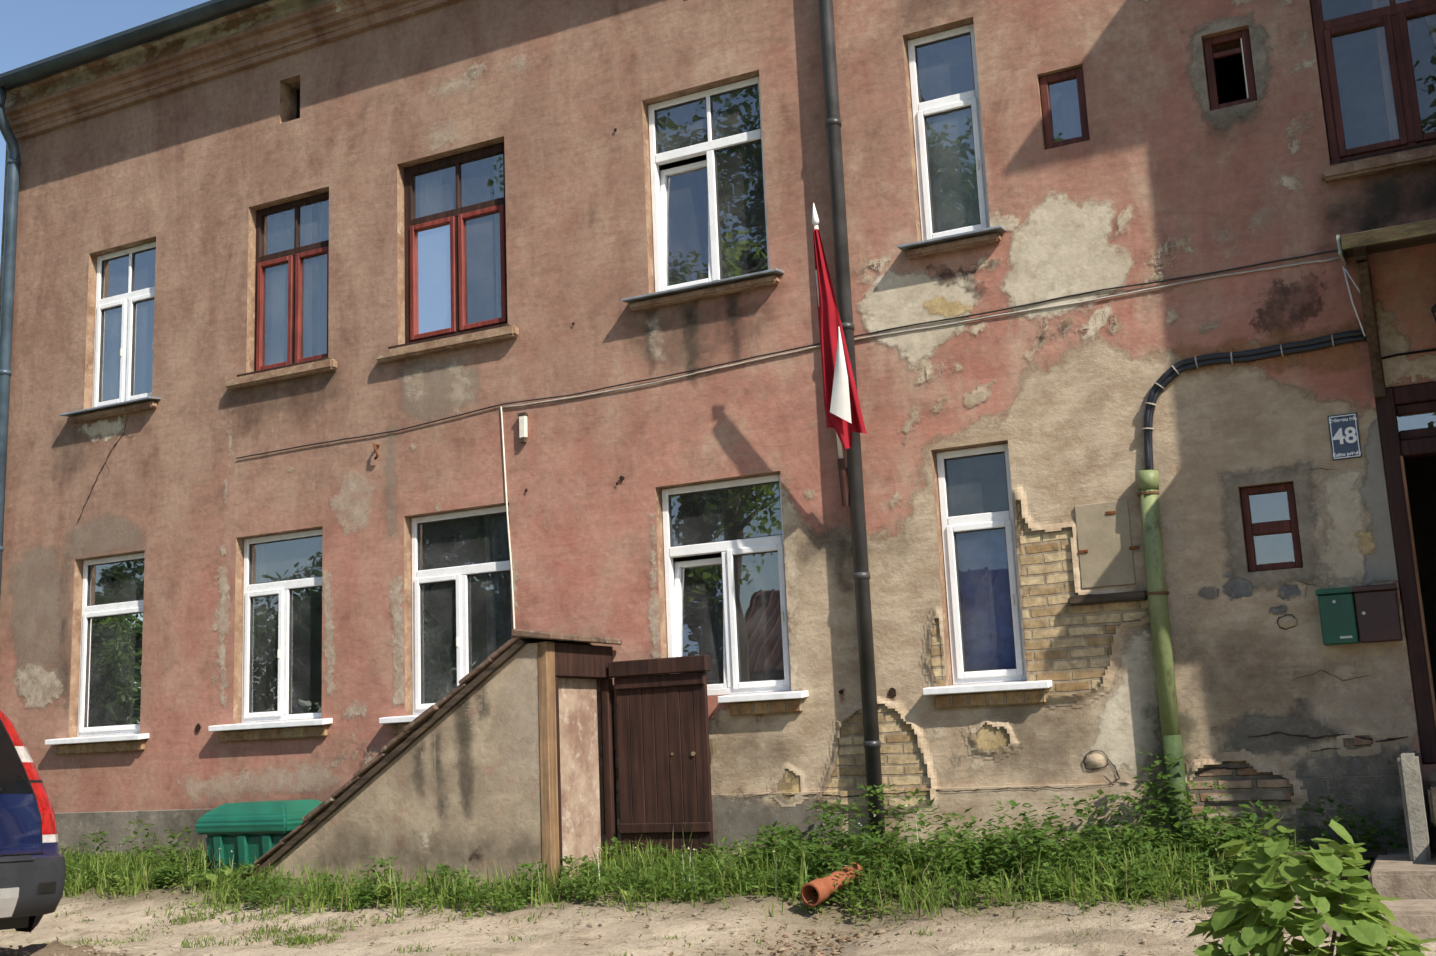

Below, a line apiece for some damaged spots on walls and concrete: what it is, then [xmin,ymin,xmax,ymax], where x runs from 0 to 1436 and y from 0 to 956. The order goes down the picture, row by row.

damp [1249,272,1325,333]
flaking render [78,414,126,441]
crack [76,420,131,524]
peeling [708,192,1418,865]
damp [458,702,486,807]
crack [1195,731,1408,775]